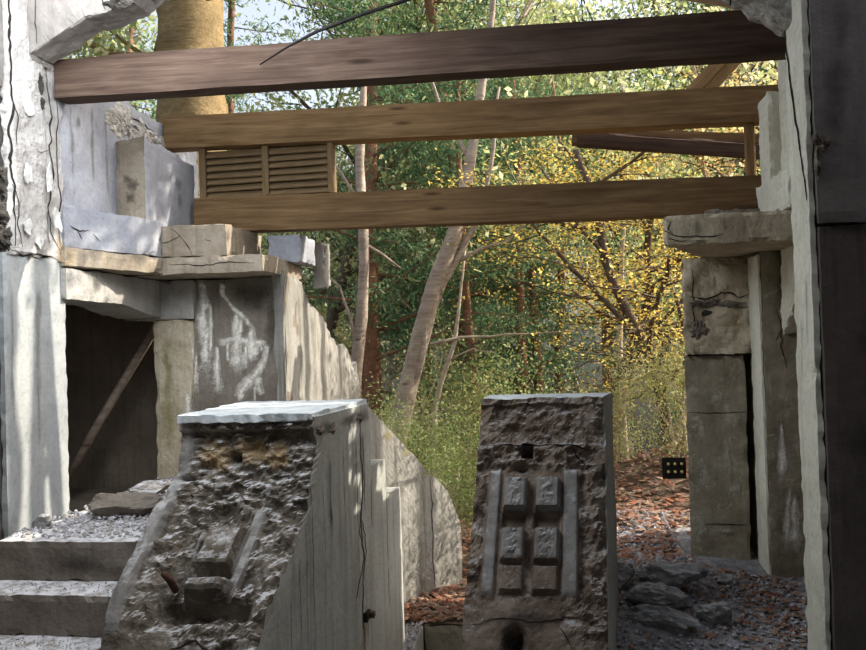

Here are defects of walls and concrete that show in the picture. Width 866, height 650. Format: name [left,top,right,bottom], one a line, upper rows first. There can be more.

spalling [102,0,135,10]
peeling [23,73,45,116]
crack [7,0,100,262]
spalling [105,102,179,154]
crack [784,30,807,201]
peeling [24,162,33,184]
spalling [0,162,13,252]
peeling [23,218,44,250]
peeling [53,207,62,233]
crack [665,221,721,242]
crack [690,269,747,322]
crack [356,428,366,650]